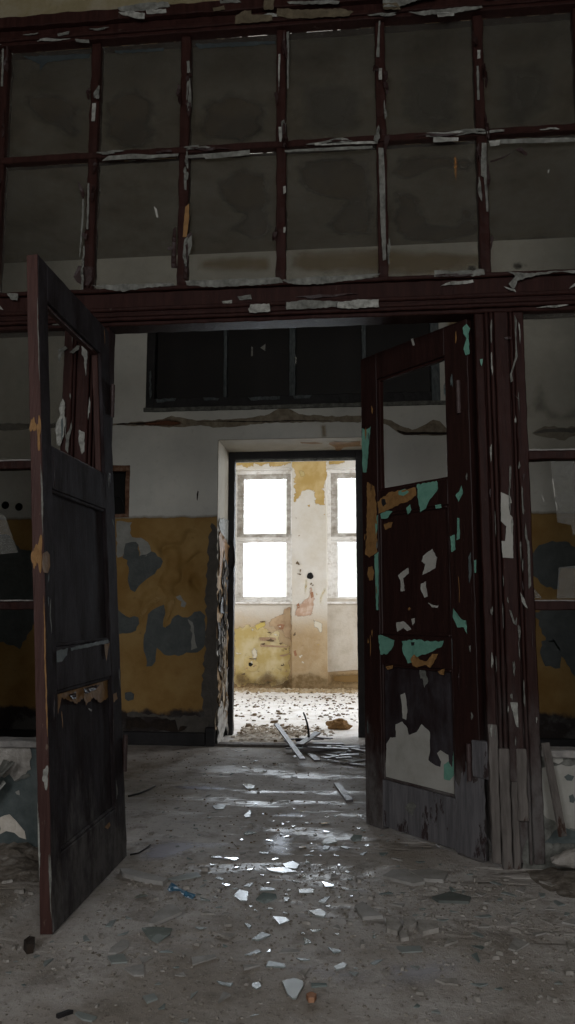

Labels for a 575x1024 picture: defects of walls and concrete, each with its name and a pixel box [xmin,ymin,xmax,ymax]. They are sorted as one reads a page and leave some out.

peeling [0,473,322,743]
peeling [236,427,442,610]
peeling [489,461,575,745]
peeling [0,747,49,795]